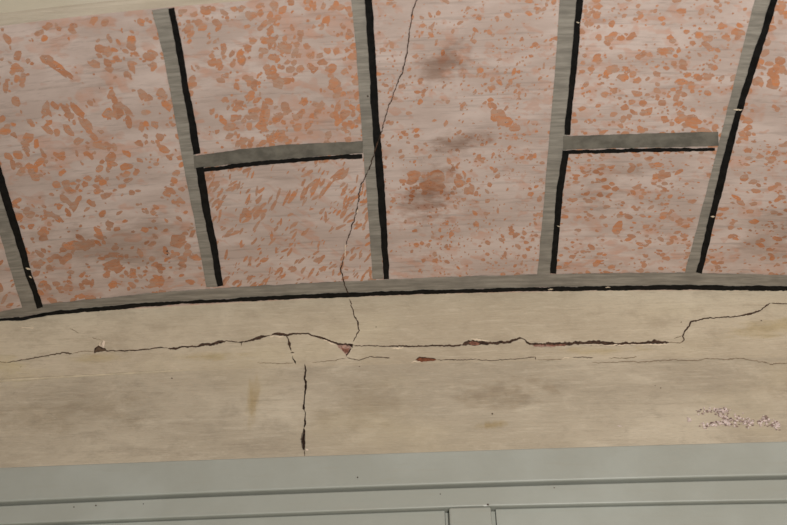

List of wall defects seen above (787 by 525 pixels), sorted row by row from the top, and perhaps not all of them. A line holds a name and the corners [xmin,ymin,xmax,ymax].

crack [105,0,787,456]
crack [0,351,93,363]
peeling [687,407,781,431]